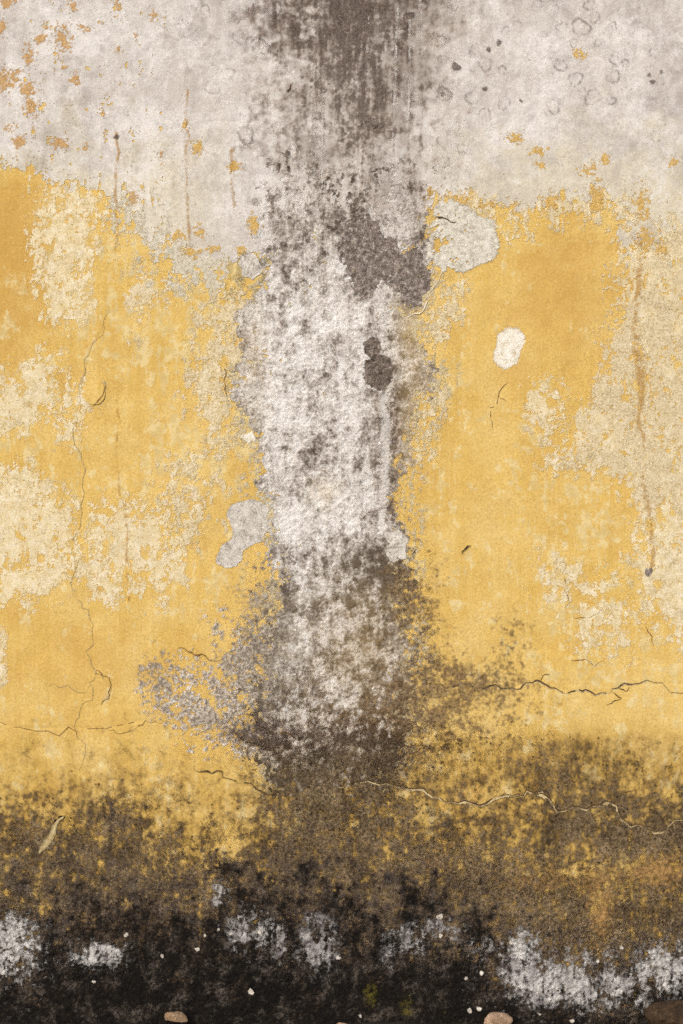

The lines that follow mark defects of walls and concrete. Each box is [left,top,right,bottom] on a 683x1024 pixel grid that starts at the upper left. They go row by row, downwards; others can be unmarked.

water stain [273,0,431,188]
peeling [0,0,683,807]
water stain [380,392,396,513]
crack [1,324,157,770]
crack [195,770,275,795]
water stain [0,722,683,1024]
crack [337,780,681,853]
crack [419,674,683,704]